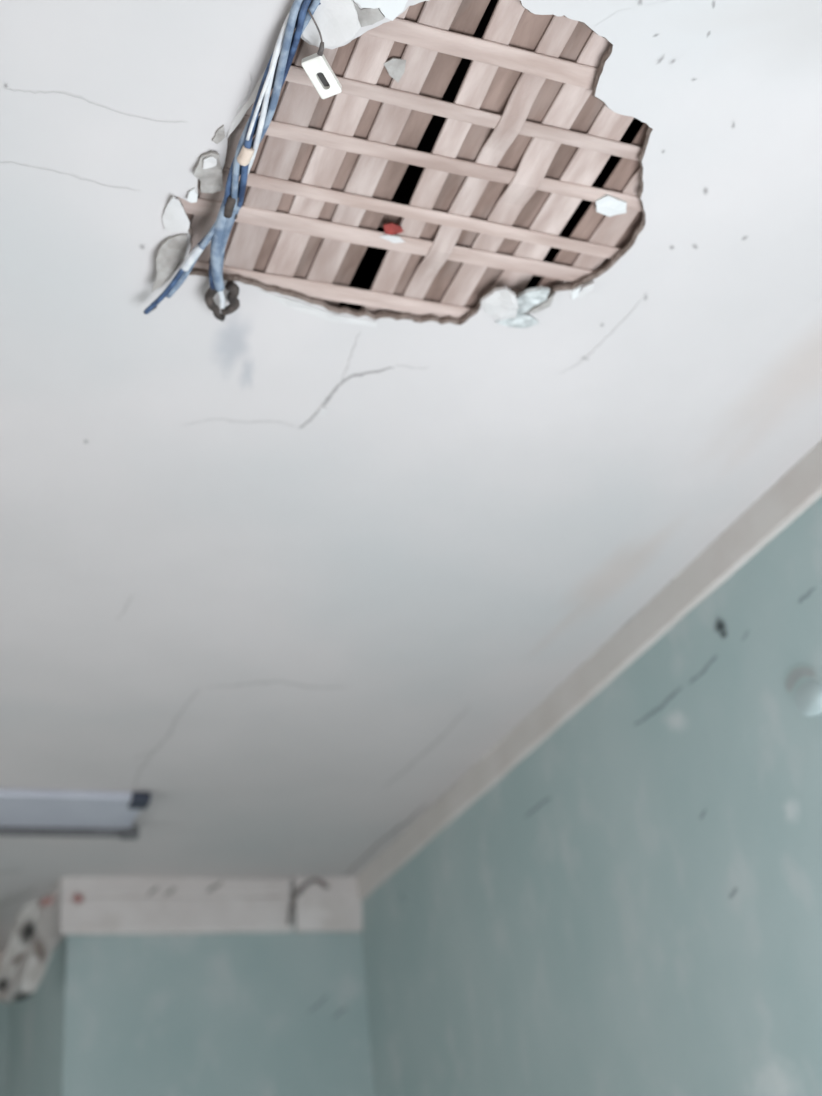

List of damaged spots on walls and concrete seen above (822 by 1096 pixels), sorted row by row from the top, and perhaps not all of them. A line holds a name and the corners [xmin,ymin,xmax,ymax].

spalling [302,0,408,47]
spalling [579,21,613,110]
spalling [137,59,279,292]
spalling [223,123,653,328]
crack [178,329,431,430]
flaking render [0,923,51,1001]